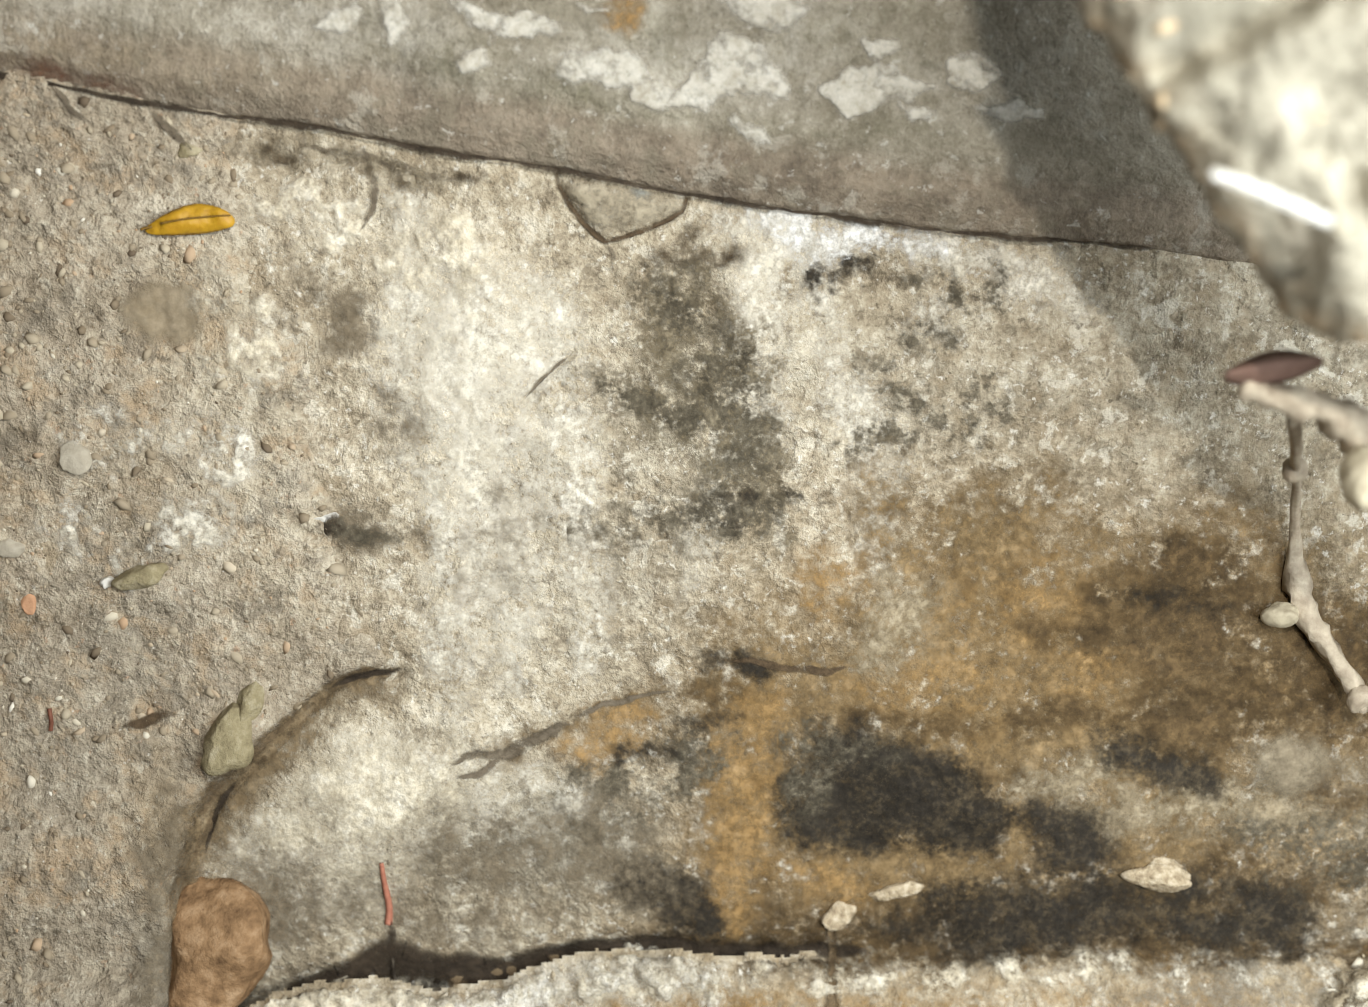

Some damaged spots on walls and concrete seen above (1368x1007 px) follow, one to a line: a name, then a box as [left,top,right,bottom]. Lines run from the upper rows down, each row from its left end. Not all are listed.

leakage [39,502,101,561]
leakage [112,420,255,575]
leakage [136,177,1085,1007]
crack [122,710,176,729]
crack [453,657,846,779]
crack [172,667,399,898]
leakage [774,717,1332,1007]
leakage [1229,815,1368,889]
crack [274,923,864,1007]